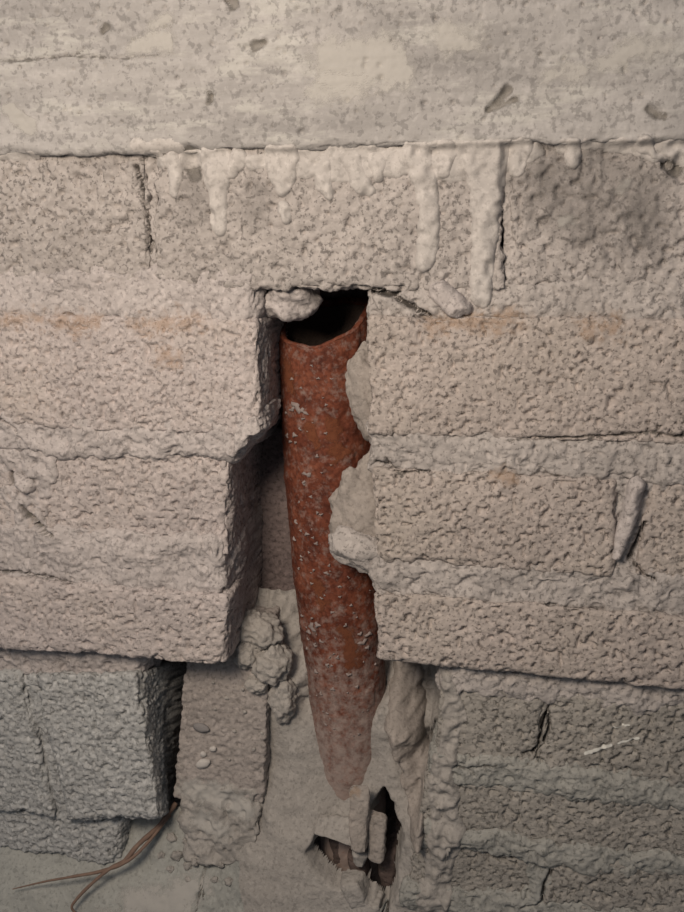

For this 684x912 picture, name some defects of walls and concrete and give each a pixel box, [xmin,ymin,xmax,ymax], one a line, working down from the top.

crack [135,166,157,252]
crack [523,710,551,753]
peeling [314,815,372,881]